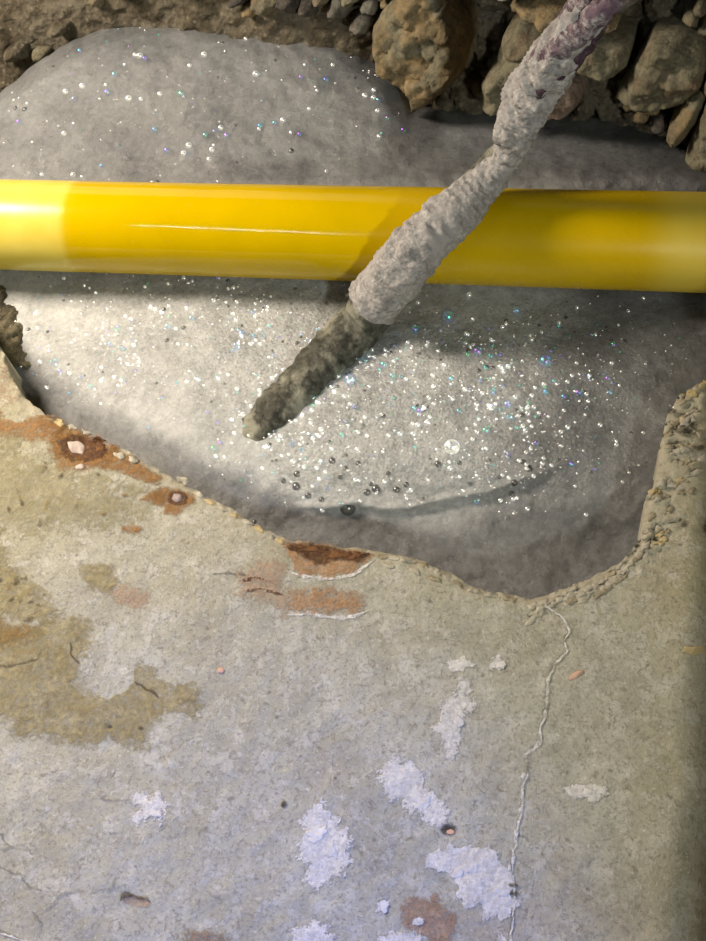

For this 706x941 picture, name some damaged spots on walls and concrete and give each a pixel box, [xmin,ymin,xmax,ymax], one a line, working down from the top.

rust [0,411,67,455]
spalling [50,419,139,470]
rust [98,445,194,515]
spalling [525,380,706,626]
spalling [194,491,517,620]
water stain [0,446,205,750]
water stain [430,676,480,760]
water stain [373,751,451,829]
crack [497,602,571,941]
water stain [294,796,354,893]
water stain [289,914,337,941]
rust [400,893,456,941]